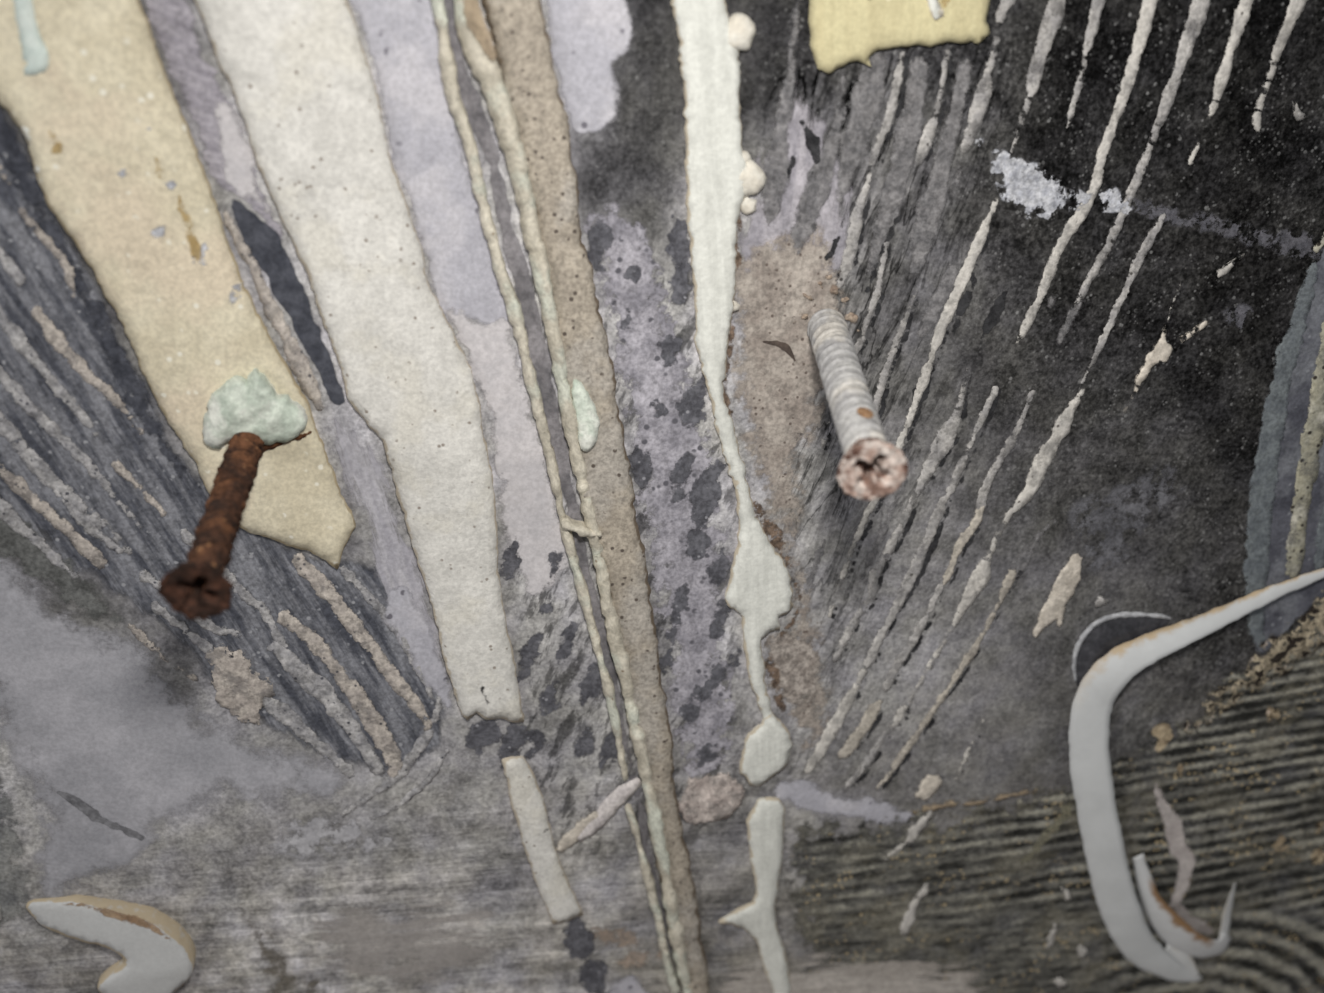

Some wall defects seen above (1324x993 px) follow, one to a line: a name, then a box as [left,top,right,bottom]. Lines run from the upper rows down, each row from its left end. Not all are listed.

corrosion [264,431,312,452]